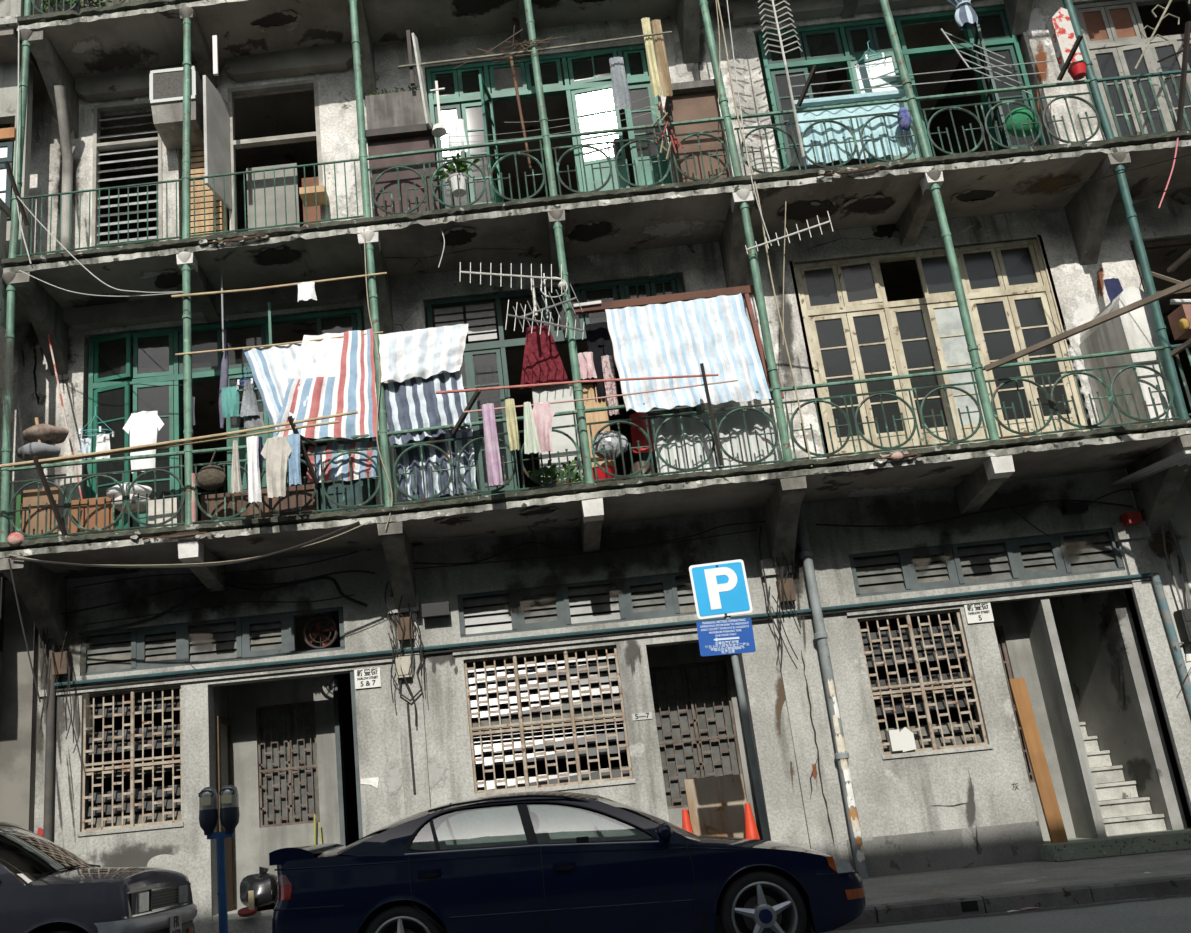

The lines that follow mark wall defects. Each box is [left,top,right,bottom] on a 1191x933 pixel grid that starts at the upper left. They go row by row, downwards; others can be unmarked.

leakage [64,567,134,579]
crack [801,651,834,843]